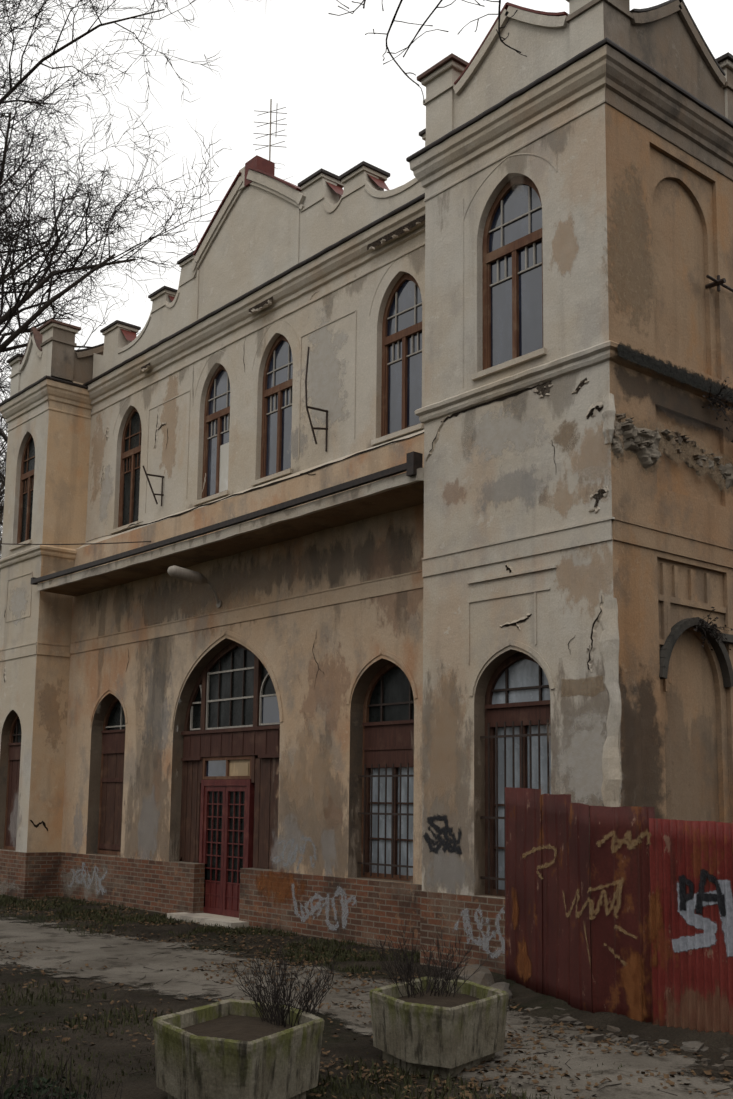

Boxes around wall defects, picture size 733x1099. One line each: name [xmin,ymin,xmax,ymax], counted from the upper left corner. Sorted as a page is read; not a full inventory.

flaking render [533,381,553,398]
flaking render [606,413,733,492]
flaking render [589,486,609,514]
crack [500,614,532,630]
crack [568,594,604,672]
rust [512,888,531,982]
rust [621,890,663,1021]